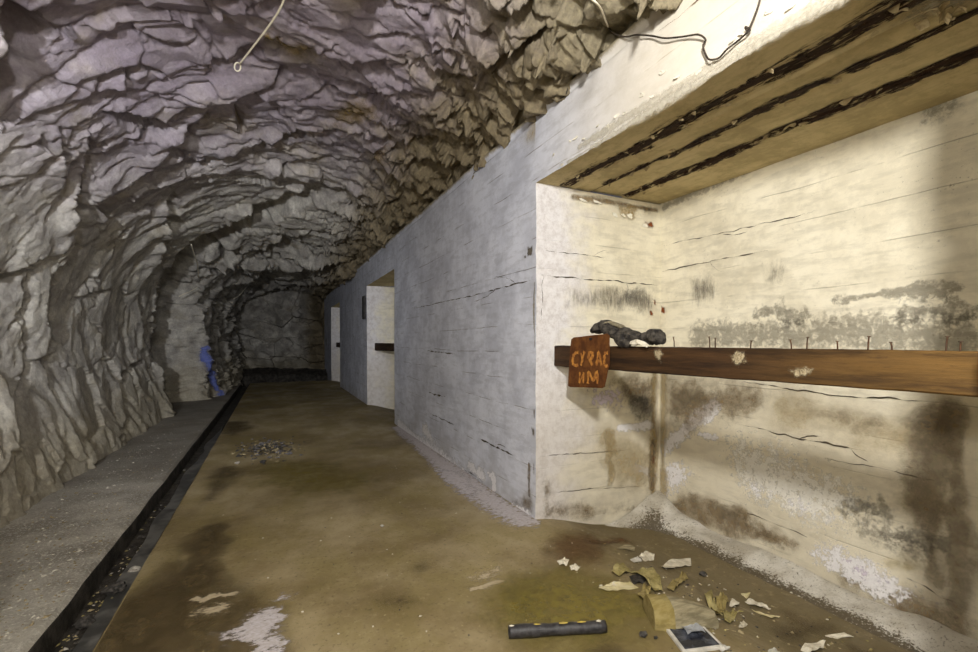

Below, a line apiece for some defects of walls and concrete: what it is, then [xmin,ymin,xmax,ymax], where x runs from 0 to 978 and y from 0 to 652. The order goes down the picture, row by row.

peeling [907,0,967,31]
peeling [552,0,843,167]
water stain [593,290,650,307]
crack [744,425,934,481]
water stain [591,377,975,634]